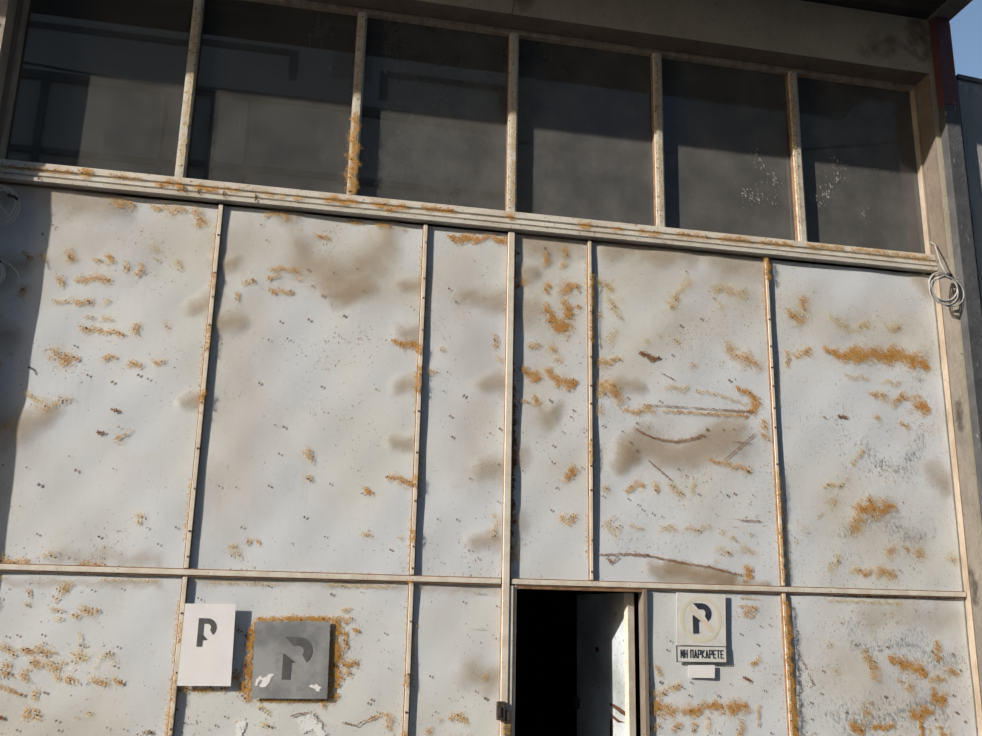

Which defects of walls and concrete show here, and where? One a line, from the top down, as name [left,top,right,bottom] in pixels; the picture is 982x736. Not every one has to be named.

rust [109,173,240,198]
rust [323,111,409,229]
rust [676,232,931,321]
rust [511,245,770,563]
rust [721,313,935,429]
rust [550,468,756,582]
rust [846,494,899,542]
rust [47,557,106,622]
rust [136,600,359,736]
rust [643,650,761,736]
rust [781,599,799,736]
rust [846,700,895,736]